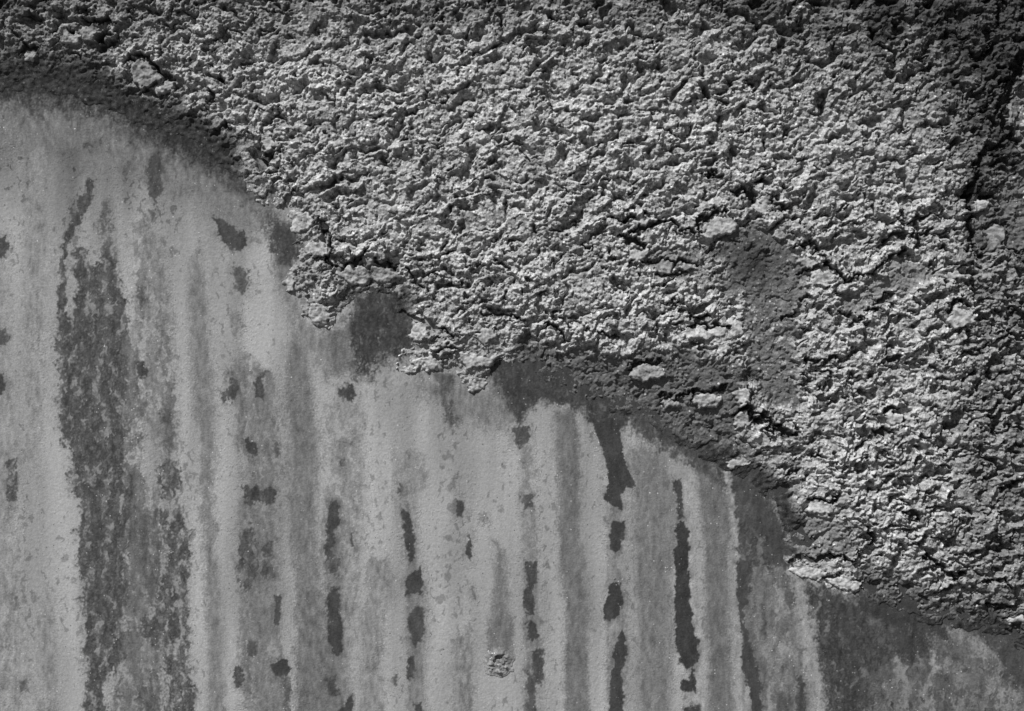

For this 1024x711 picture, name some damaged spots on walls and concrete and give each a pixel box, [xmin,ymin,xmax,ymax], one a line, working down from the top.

water stain [0,82,434,711]
water stain [400,349,1024,711]